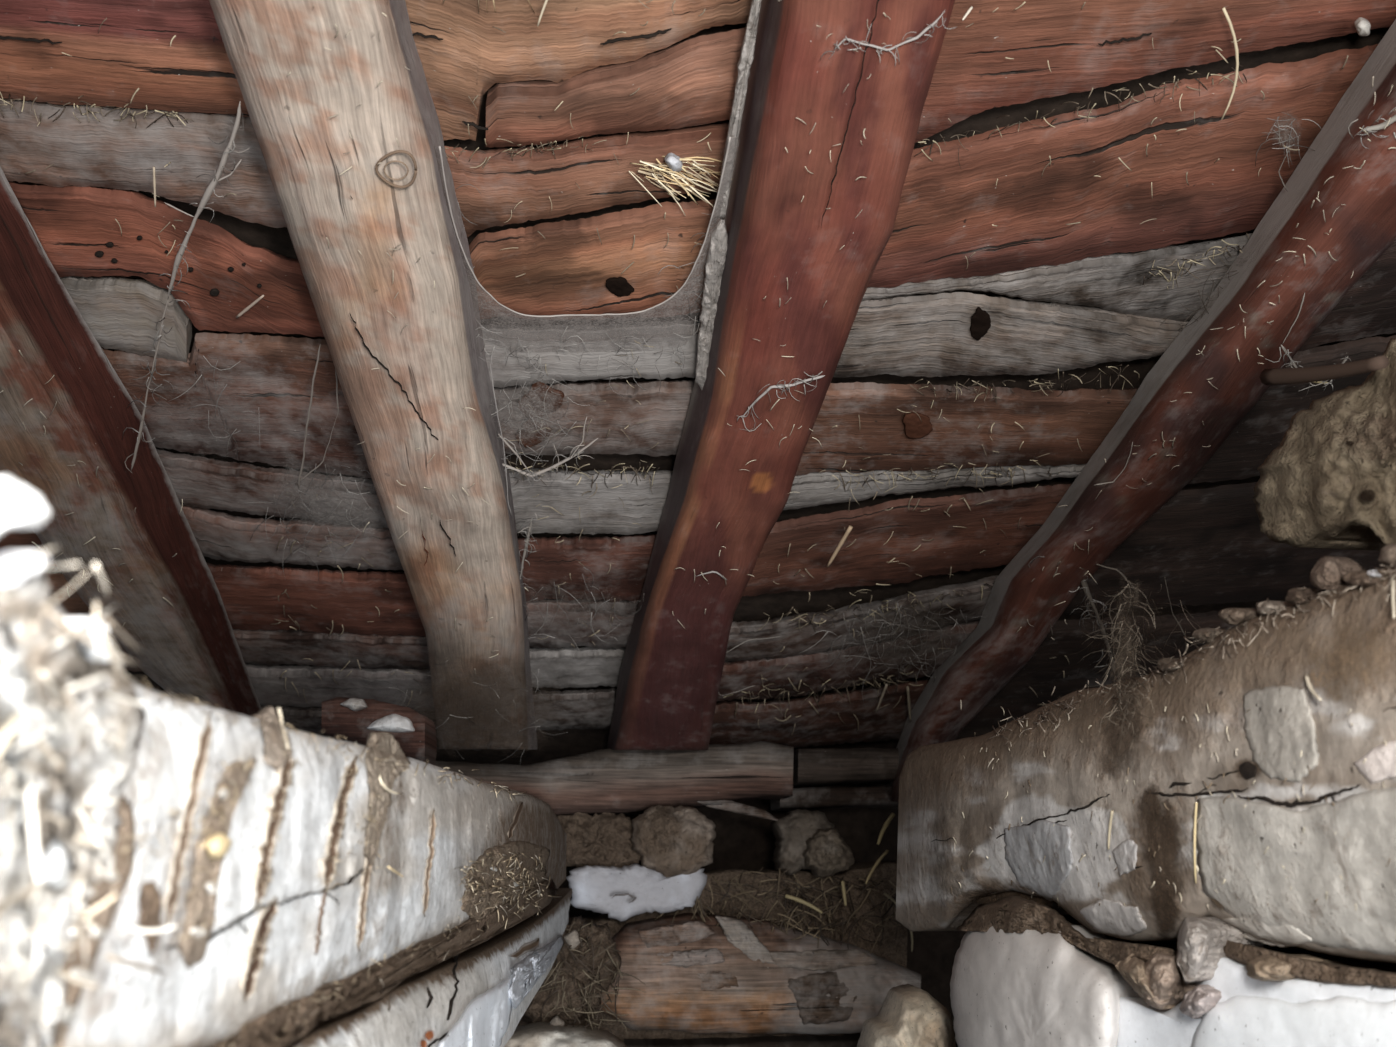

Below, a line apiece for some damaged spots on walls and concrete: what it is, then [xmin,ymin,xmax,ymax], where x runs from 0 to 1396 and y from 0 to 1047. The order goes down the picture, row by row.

crack [821,0,879,227]
crack [1146,770,1360,808]
crack [996,794,1109,839]